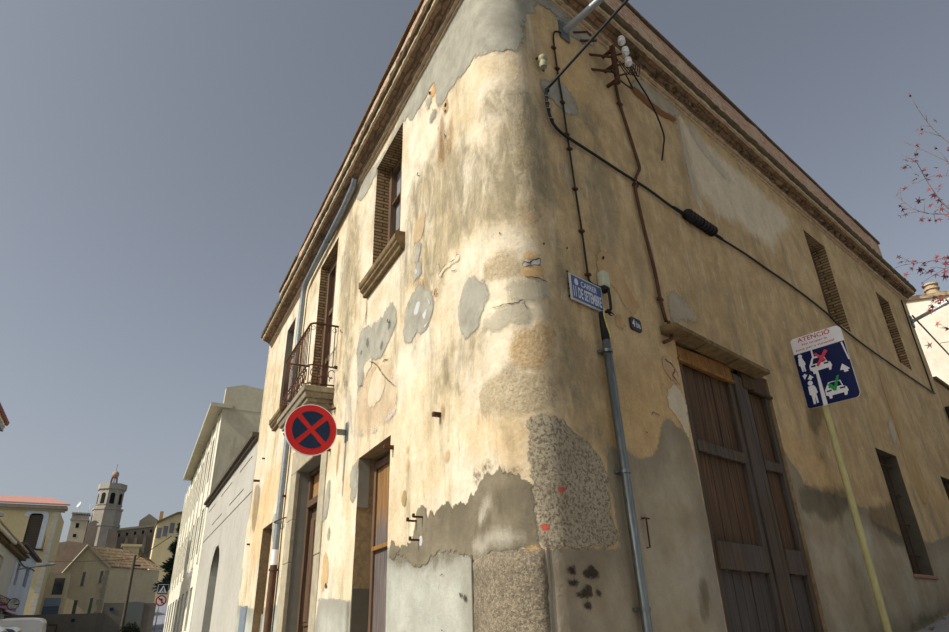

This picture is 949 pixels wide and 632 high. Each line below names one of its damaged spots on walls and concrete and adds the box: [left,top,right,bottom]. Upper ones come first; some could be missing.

peeling [426,84,446,123]
spalling [389,250,618,568]
water stain [568,565,602,610]